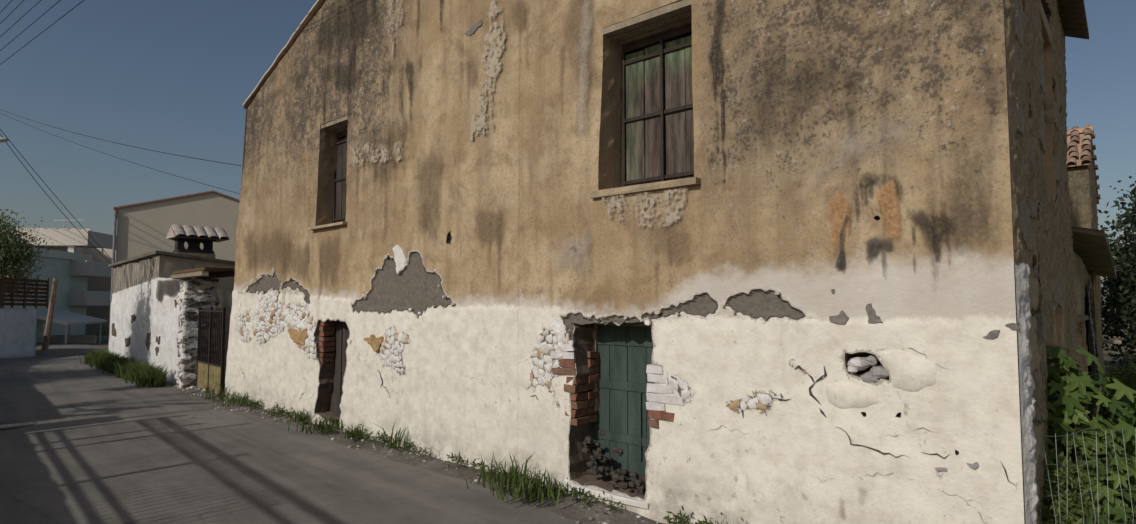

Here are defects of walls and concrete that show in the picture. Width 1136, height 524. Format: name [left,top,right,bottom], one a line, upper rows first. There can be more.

peeling [464,0,506,141]
damp [709,0,726,170]
peeling [602,186,687,228]
damp [835,175,898,270]
damp [912,212,949,260]
spalling [245,270,310,303]
spalling [364,335,384,352]
spalling [352,245,455,317]
spalling [560,289,806,363]
spalling [829,310,849,324]
spalling [865,303,883,323]
crack [707,365,988,524]